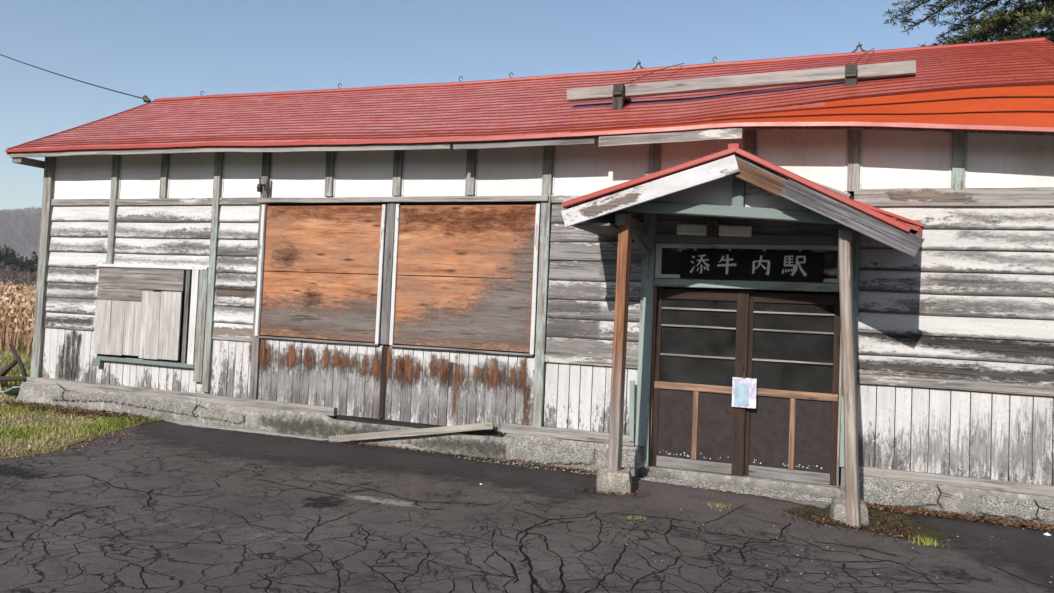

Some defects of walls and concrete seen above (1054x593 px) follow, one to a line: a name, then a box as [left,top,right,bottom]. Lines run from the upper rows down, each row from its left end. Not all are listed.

peeling [579,193,641,218]
peeling [889,186,1054,266]
water stain [260,206,535,400]
peeling [896,275,1054,314]
rust [248,338,531,425]
peeling [858,329,1054,386]
crack [0,473,224,589]
crack [327,557,340,593]
crack [263,480,485,540]
crack [364,504,957,593]